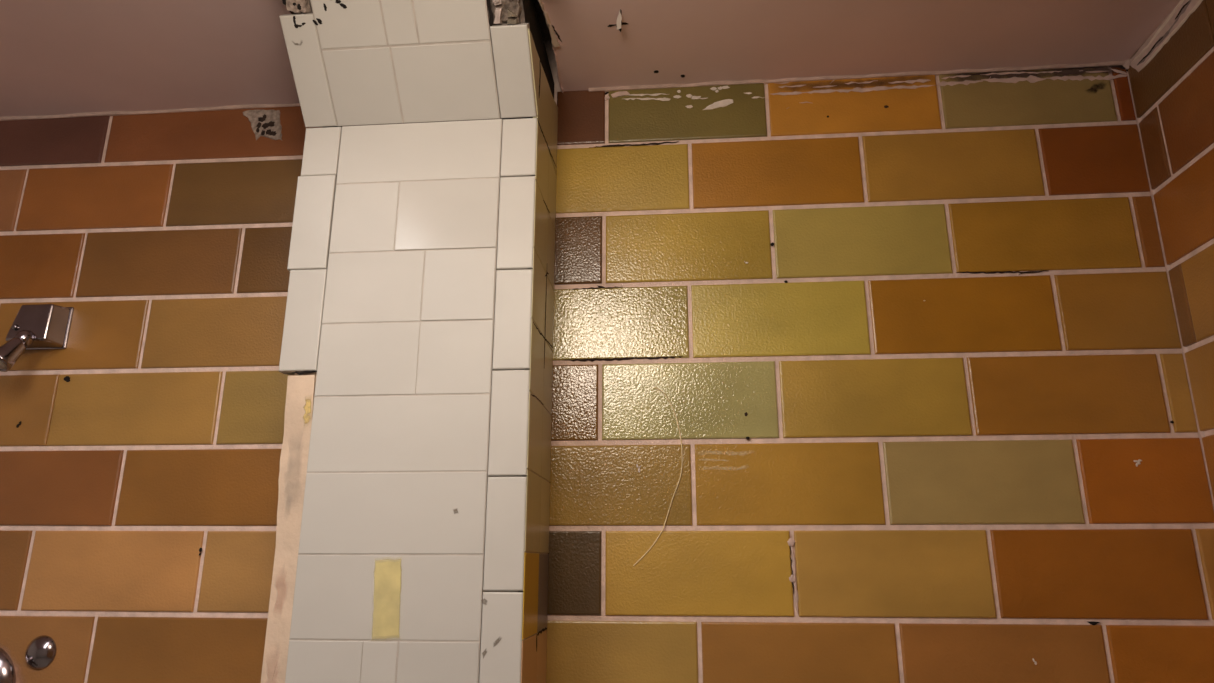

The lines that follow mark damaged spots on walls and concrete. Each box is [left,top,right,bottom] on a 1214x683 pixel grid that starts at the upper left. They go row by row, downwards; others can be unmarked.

spalling [282,0,347,28]
spalling [487,0,522,26]
peeling [538,0,564,93]
crack [1018,0,1192,75]